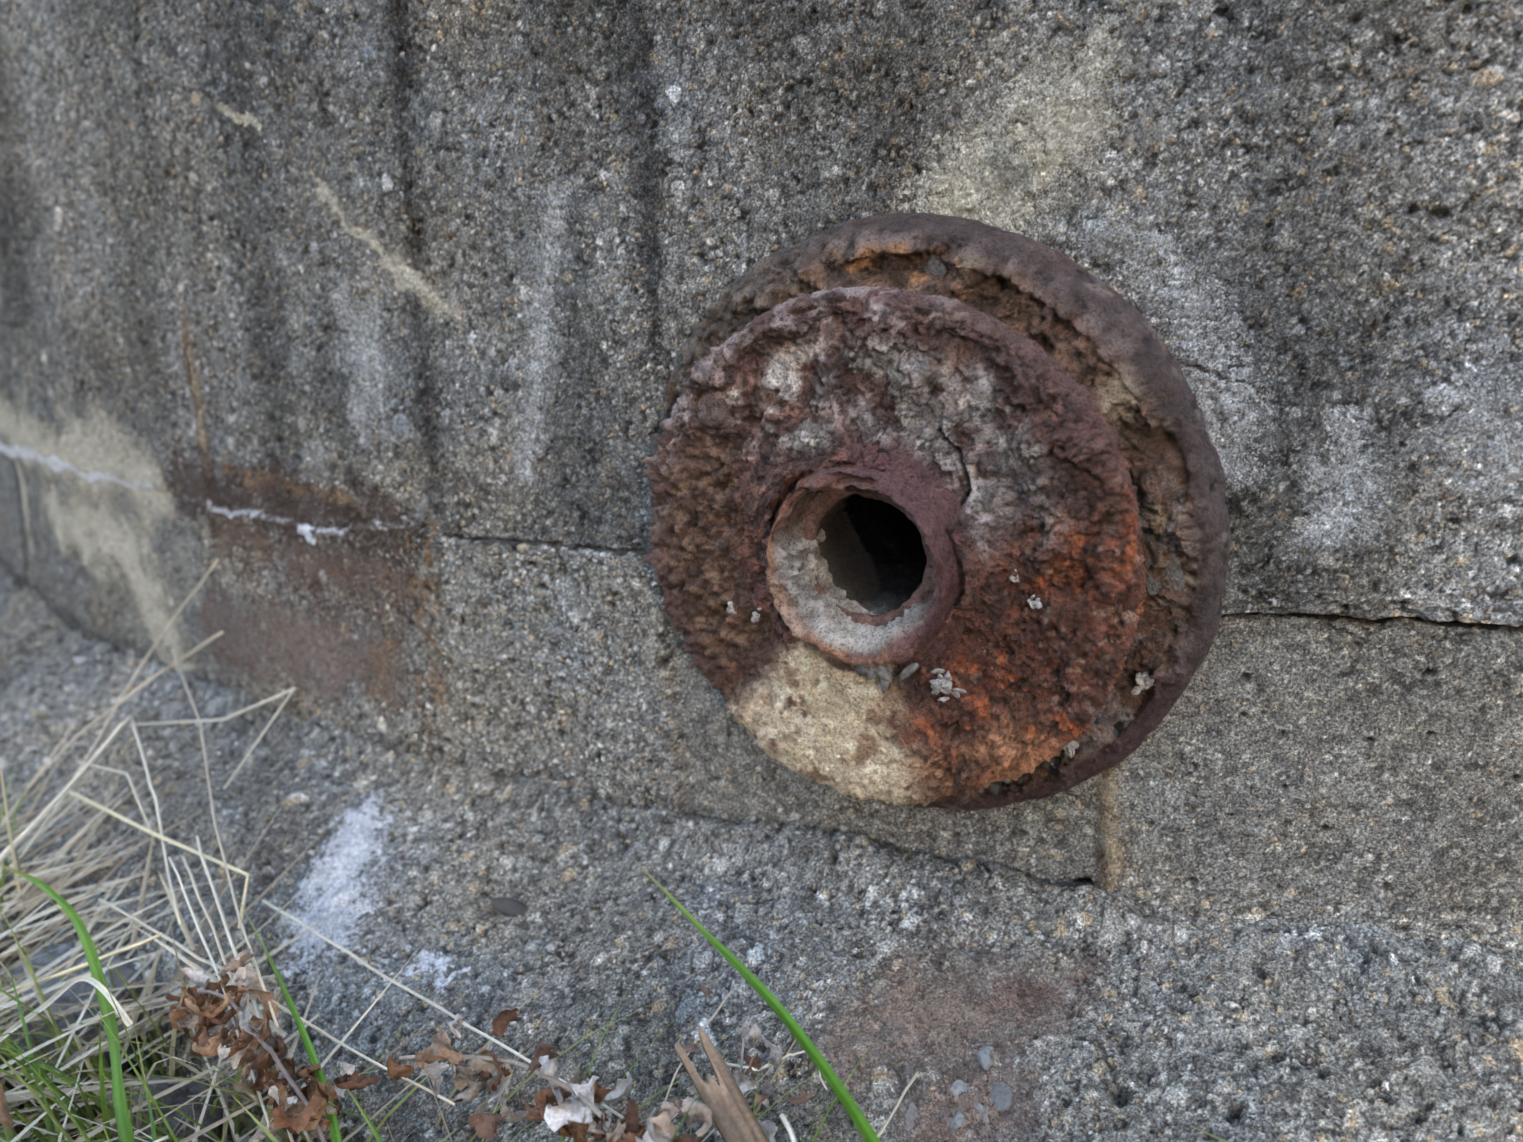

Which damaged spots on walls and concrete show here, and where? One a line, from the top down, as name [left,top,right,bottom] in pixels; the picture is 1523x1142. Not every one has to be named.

rust [164,301,451,737]
crack [1221,605,1523,634]